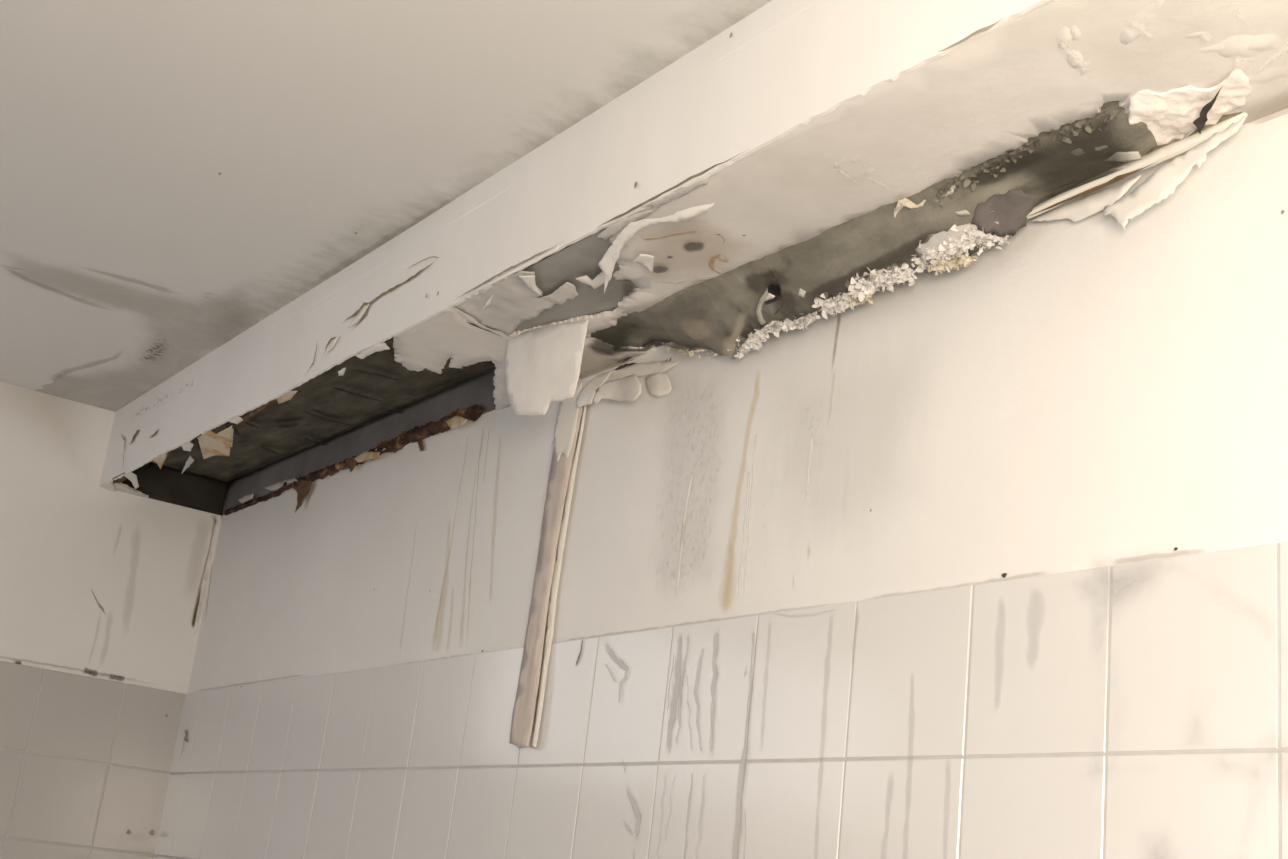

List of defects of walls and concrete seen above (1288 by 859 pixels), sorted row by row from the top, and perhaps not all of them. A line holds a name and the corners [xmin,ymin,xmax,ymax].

corrosion [221,404,483,517]
spalling [101,101,1158,516]